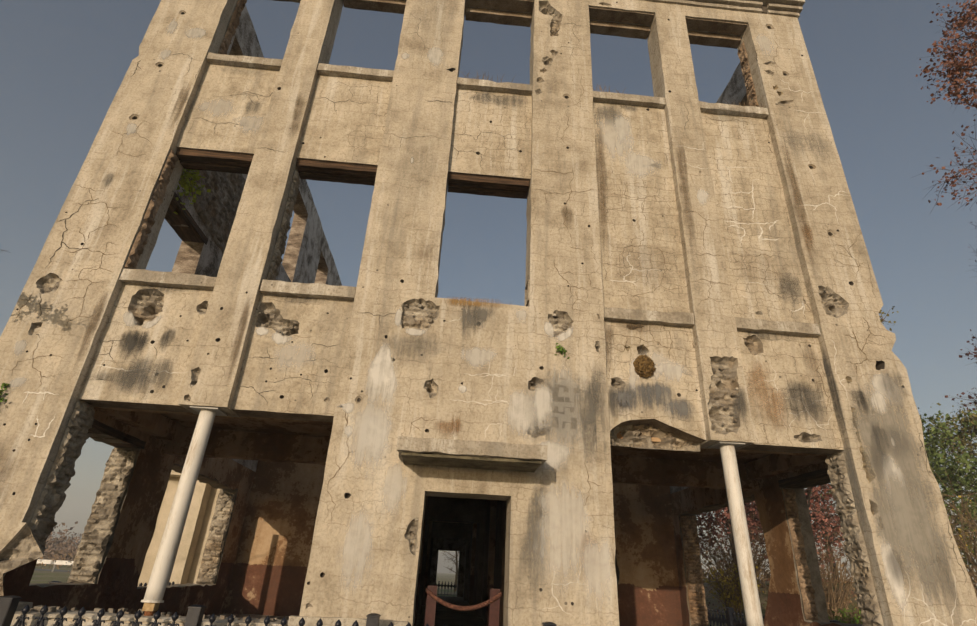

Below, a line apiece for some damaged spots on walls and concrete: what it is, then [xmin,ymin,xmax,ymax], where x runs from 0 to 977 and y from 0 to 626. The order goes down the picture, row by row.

crack [397,92,529,171]
crack [534,23,805,315]
crack [799,191,873,287]
crack [11,185,122,438]
damp [101,312,168,387]
spalling [128,288,164,326]
spalling [400,298,440,330]
damp [508,361,690,469]
flaking render [610,423,700,452]
spalling [708,356,741,435]
damp [789,386,820,411]
damp [823,350,943,608]